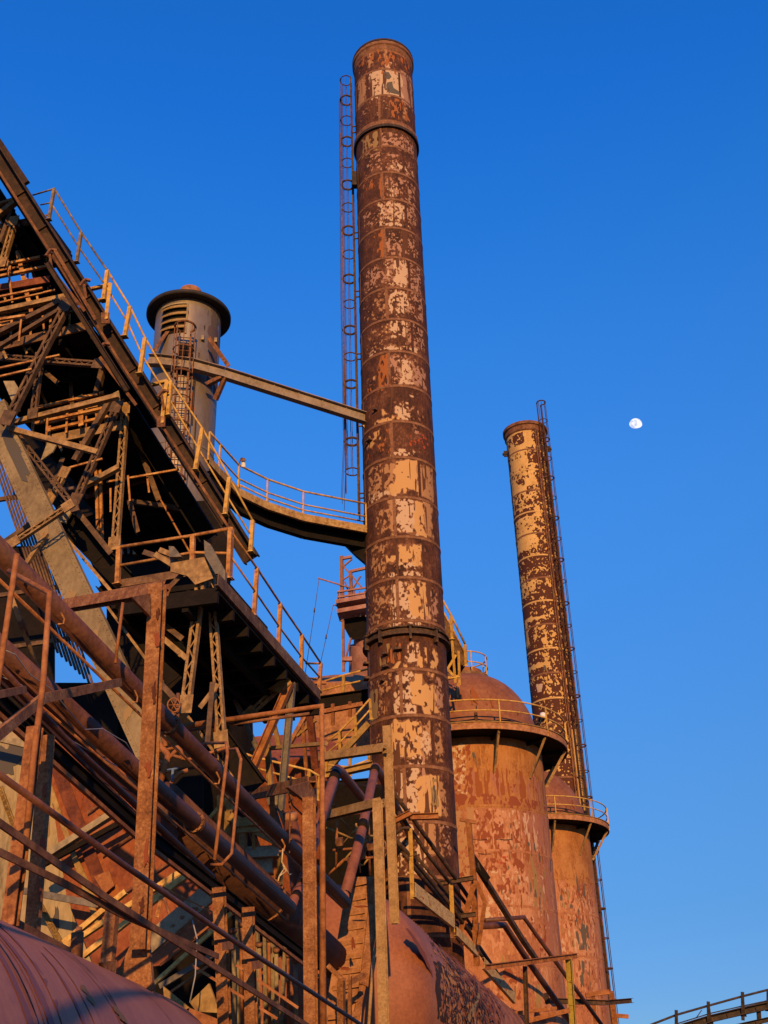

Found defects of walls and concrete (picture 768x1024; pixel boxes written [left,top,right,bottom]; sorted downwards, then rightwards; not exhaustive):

peeling [357,49,413,126]
rust [358,49,416,193]
rust [361,170,415,270]
rust [363,306,407,400]
peeling [363,132,427,450]
rust [365,416,391,506]
rust [407,380,429,515]
rust [413,551,436,655]
rust [507,430,577,793]
rust [381,721,407,797]
peeling [369,641,452,881]
rust [418,678,445,869]